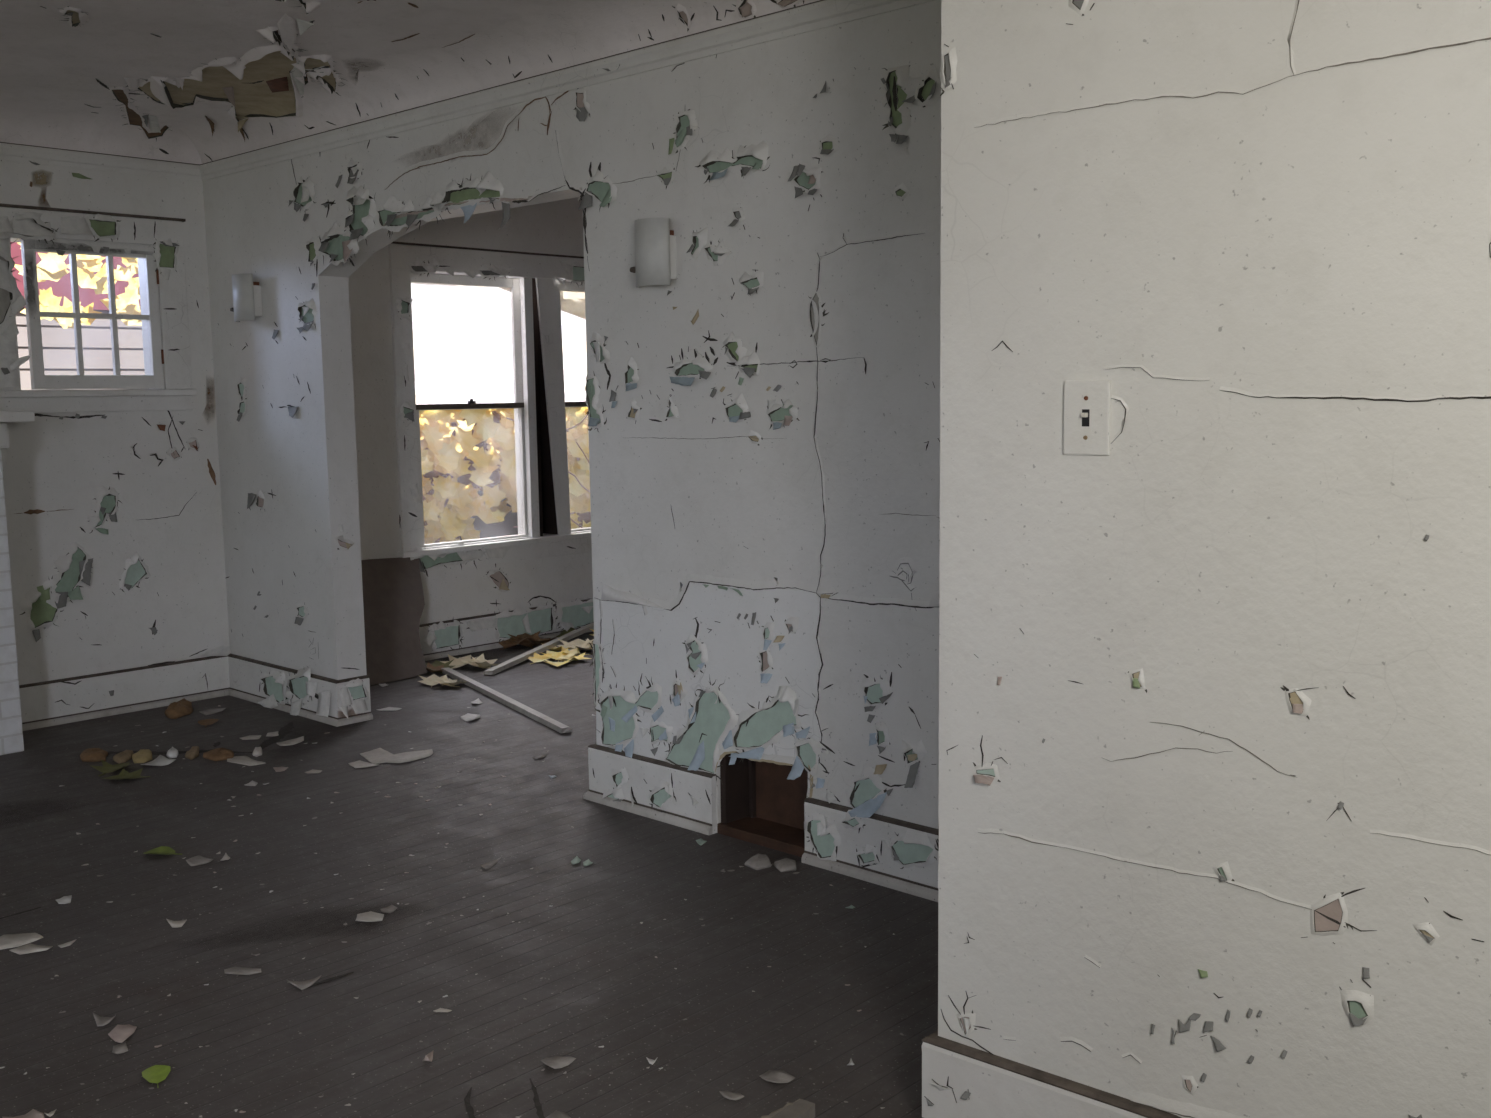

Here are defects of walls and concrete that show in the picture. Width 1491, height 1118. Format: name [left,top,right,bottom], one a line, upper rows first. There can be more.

flaking render [96,0,349,154]
peeling [652,109,770,188]
peeling [881,44,957,144]
crack [974,0,1491,128]
peeling [0,211,136,388]
peeling [289,140,529,341]
peeling [585,269,800,446]
crack [814,230,926,293]
crack [1104,364,1491,443]
peeling [16,472,125,642]
crack [595,347,934,757]
peeling [410,542,958,869]